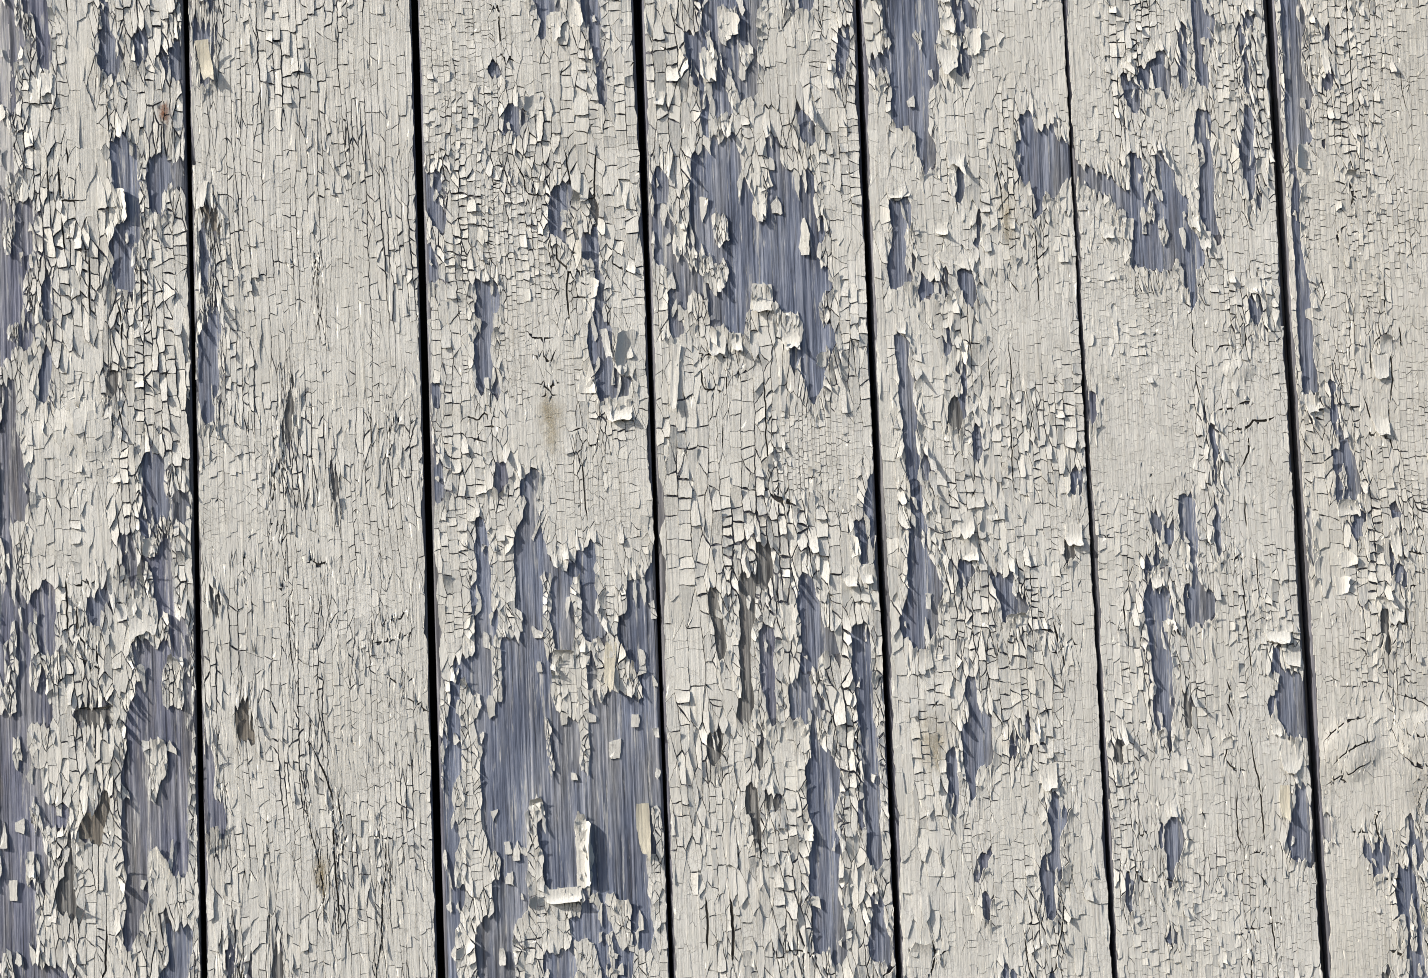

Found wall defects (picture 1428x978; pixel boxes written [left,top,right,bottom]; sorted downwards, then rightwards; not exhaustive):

crack [47,148,143,373]
peeling [0,0,249,978]
crack [304,745,387,978]
peeling [441,439,662,978]
crack [529,245,628,397]
crack [705,897,735,961]
crack [699,332,792,504]
peeling [650,0,843,410]
peeling [699,512,932,978]
peeling [867,0,1029,670]
peeling [1012,0,1262,312]
crack [1191,319,1279,978]